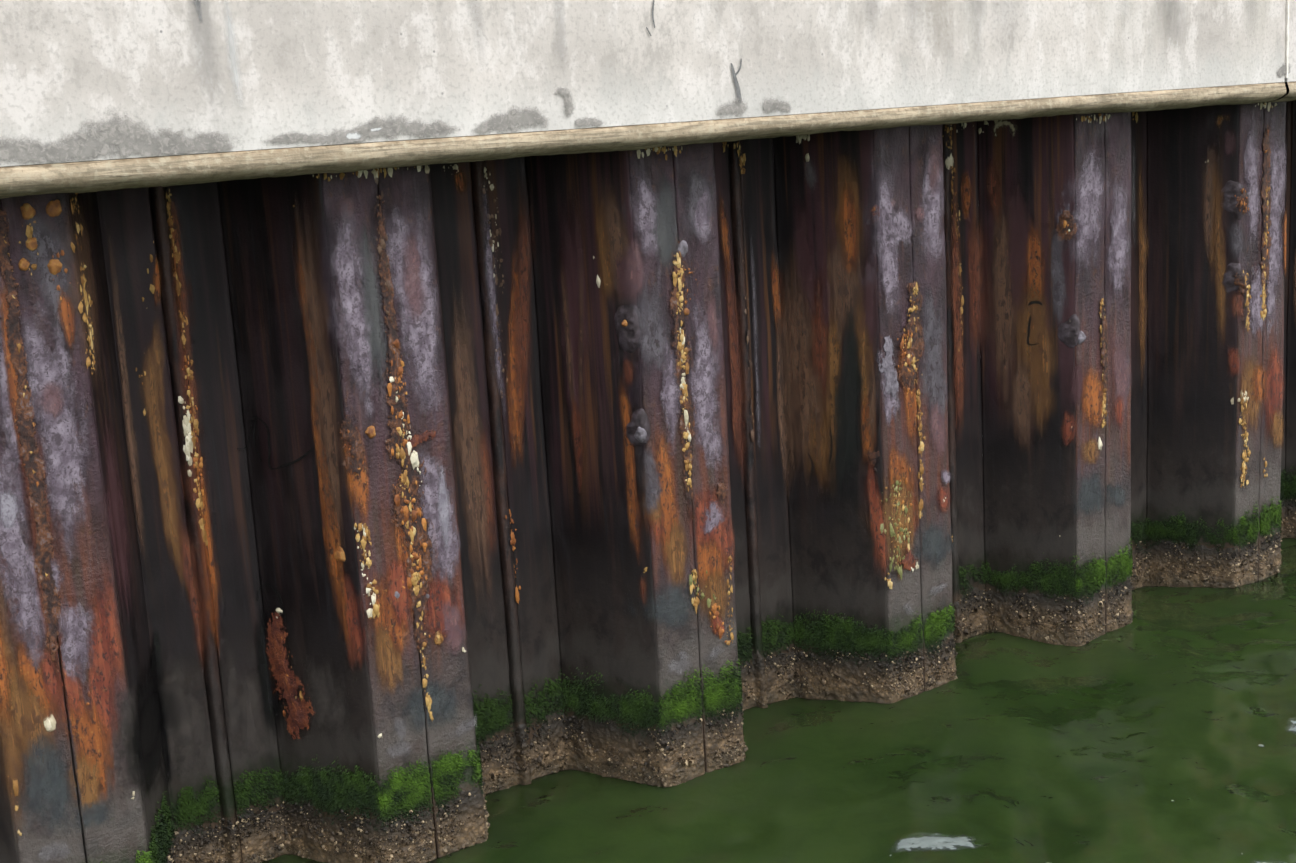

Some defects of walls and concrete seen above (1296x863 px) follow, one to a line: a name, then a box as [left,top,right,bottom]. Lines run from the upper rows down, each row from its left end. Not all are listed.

leakage [556,88,602,127]
corrosion [0,189,218,813]
corrosion [299,177,466,721]
corrosion [454,313,521,604]
corrosion [483,167,533,448]
corrosion [623,240,734,645]
corrosion [721,202,761,471]
corrosion [772,164,950,589]
corrosion [945,124,1053,443]
corrosion [1063,174,1147,513]
corrosion [1230,350,1284,488]
corrosion [256,608,316,740]